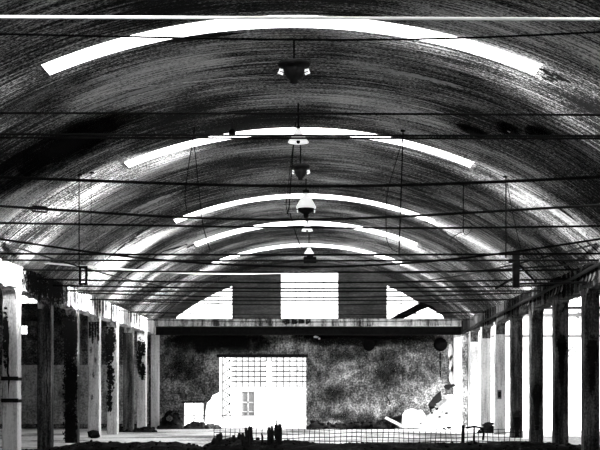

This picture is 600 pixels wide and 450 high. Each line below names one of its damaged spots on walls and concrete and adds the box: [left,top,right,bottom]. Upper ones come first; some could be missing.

damp [457,123,487,135]
damp [498,122,549,135]